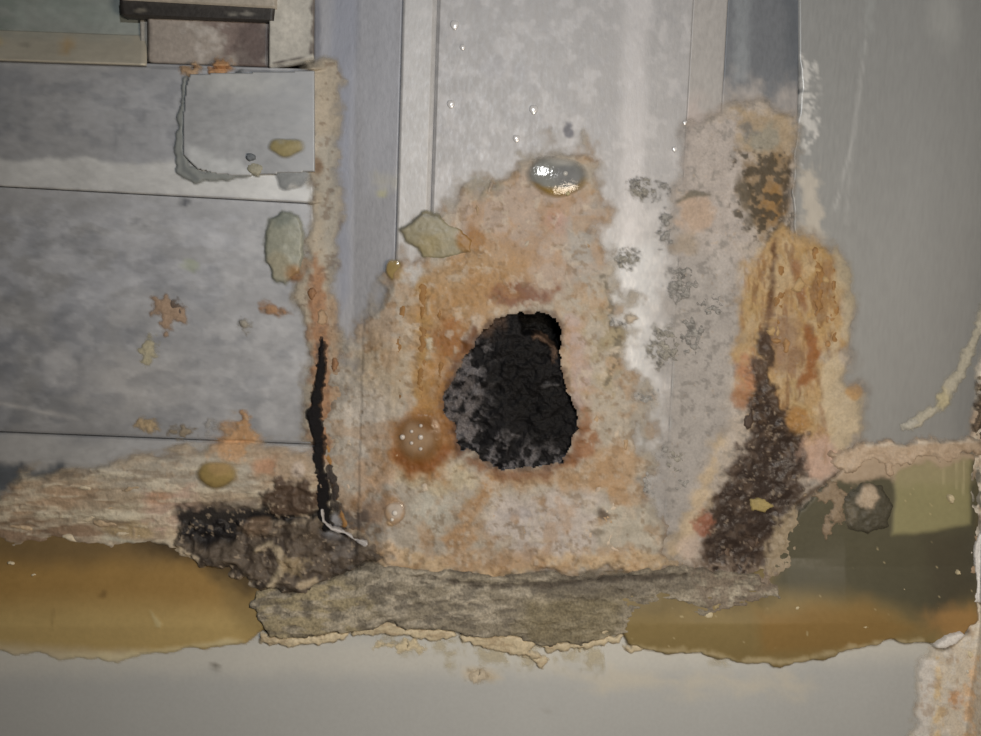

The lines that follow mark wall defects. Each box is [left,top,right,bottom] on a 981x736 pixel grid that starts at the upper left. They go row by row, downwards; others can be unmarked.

leakage [630,178,670,200]
leakage [658,213,676,244]
leakage [616,248,640,269]
leakage [669,267,722,315]
rust [0,57,866,594]
leakage [646,317,704,370]
crack [306,337,376,562]
peeling [971,533,981,604]
spalling [249,563,781,669]
peeling [933,631,965,648]